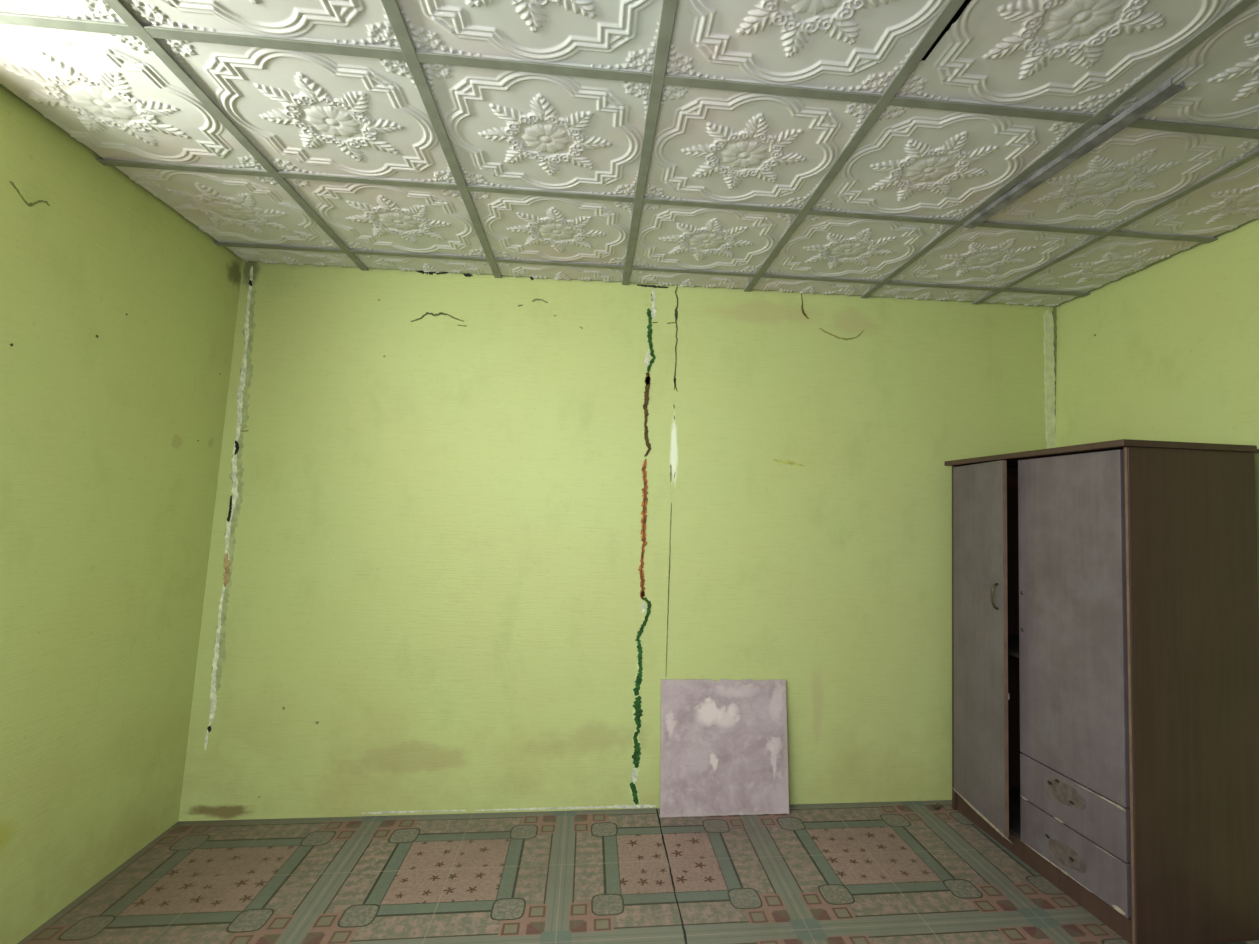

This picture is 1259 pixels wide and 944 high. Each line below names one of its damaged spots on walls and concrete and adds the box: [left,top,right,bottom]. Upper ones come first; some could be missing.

crack [410,312,466,326]
crack [629,286,687,944]
leakage [180,802,269,820]